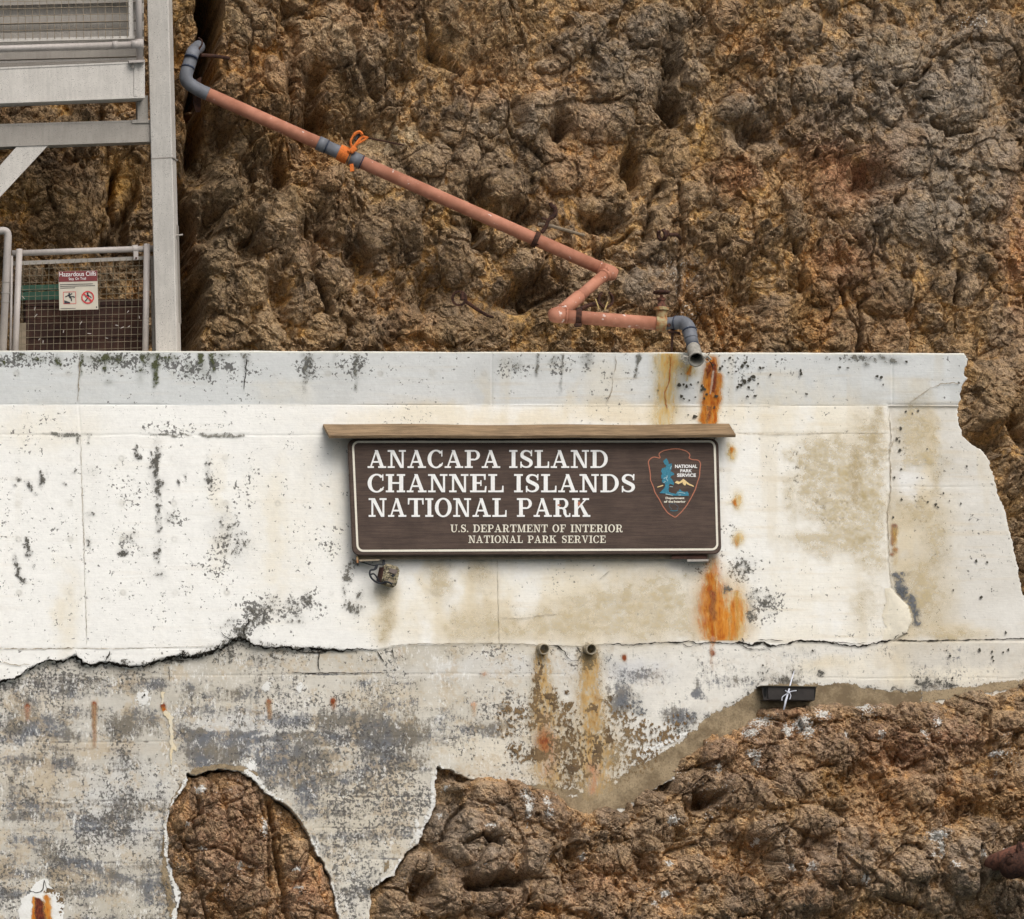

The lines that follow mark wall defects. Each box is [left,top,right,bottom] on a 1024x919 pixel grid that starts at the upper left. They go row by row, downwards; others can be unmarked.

corrosion [657,353,723,425]
crack [0,442,1024,683]
corrosion [697,559,745,656]
corrosion [532,646,615,796]
peeling [494,651,1024,814]
peeling [160,764,283,919]
spalling [368,858,401,890]
spalling [408,775,436,848]